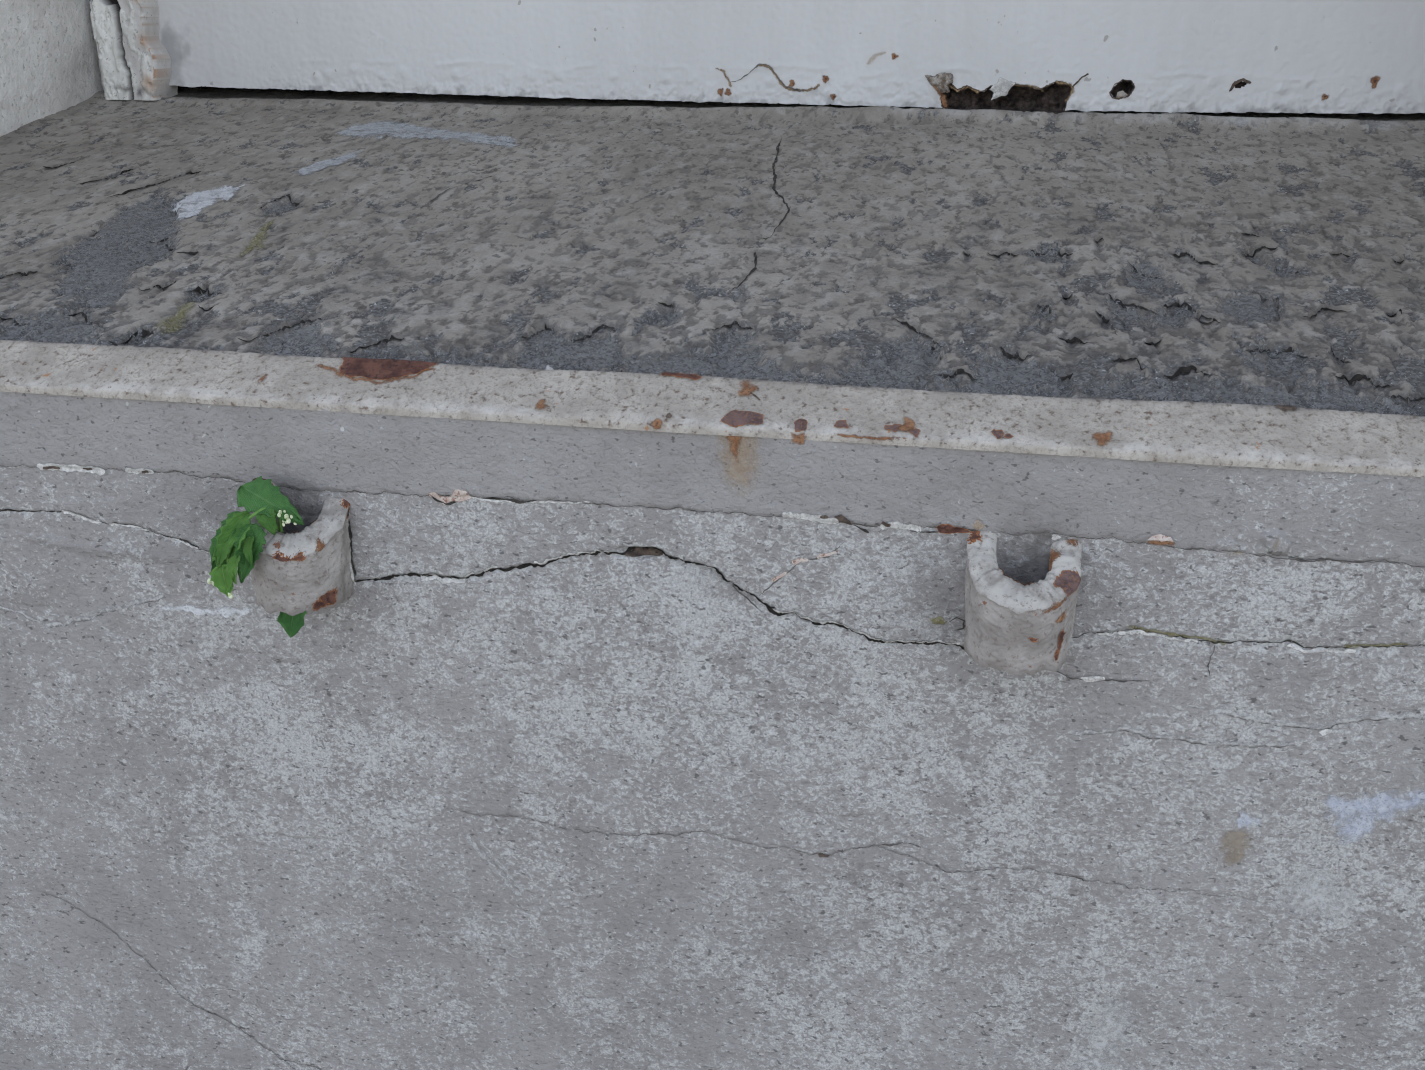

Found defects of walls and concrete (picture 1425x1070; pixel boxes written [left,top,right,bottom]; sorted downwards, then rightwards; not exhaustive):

spalling [925,73,1071,113]
crack [733,138,790,289]
spalling [0,169,223,347]
spalling [988,244,1073,264]
corrosion [317,357,438,384]
spalling [238,257,1425,417]
corrosion [720,381,763,460]
corrosion [834,417,920,441]
crack [279,486,782,517]
crack [353,522,964,650]
corrosion [1053,570,1081,660]
crack [924,526,1422,568]